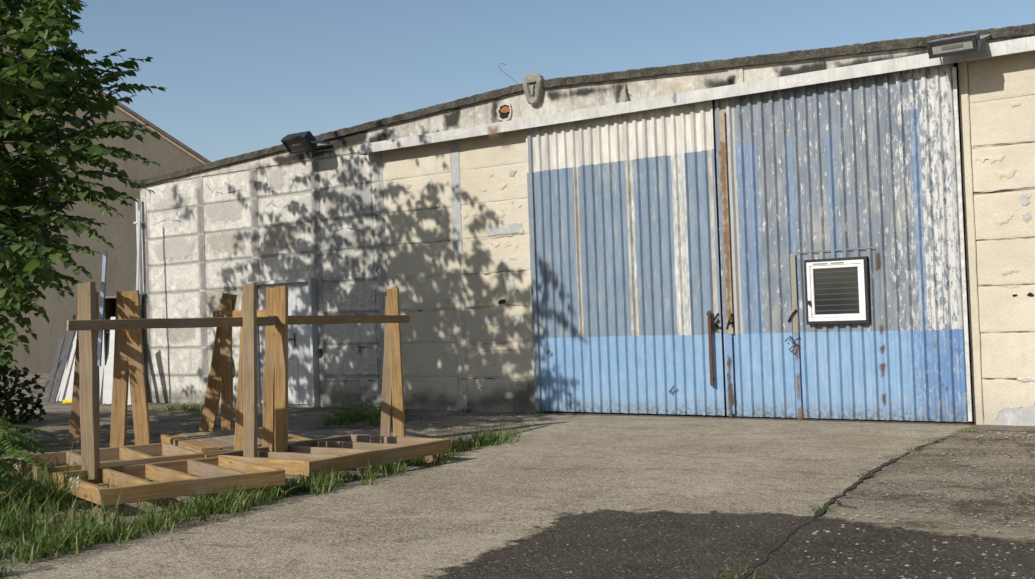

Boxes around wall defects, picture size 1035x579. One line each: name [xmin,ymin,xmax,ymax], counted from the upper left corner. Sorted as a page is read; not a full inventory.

corrosion [719,142,731,318]
peeling [485,312,521,329]
peeling [984,401,1035,426]